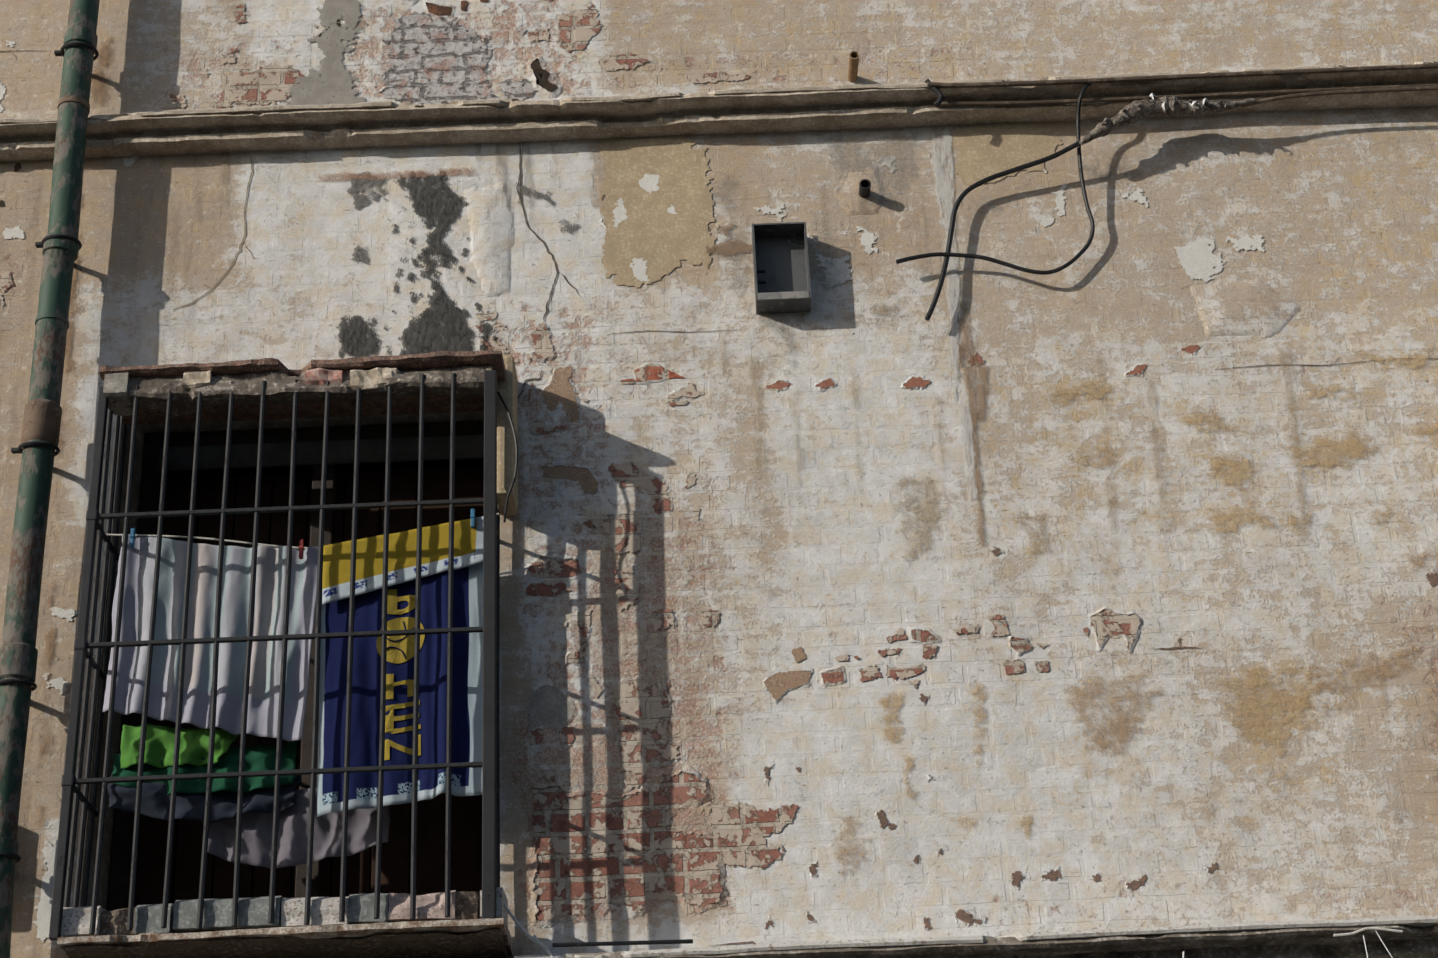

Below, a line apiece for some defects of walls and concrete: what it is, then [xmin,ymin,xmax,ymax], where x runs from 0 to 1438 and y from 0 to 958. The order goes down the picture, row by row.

spalling [198,47,304,109]
spalling [375,0,602,104]
spalling [598,53,651,71]
crack [173,153,253,310]
crack [516,142,579,323]
spalling [621,362,704,407]
spalling [524,553,586,597]
spalling [538,461,676,632]
spalling [1426,570,1438,587]
spalling [762,614,1049,706]
spalling [1083,607,1143,652]
spalling [523,609,799,928]